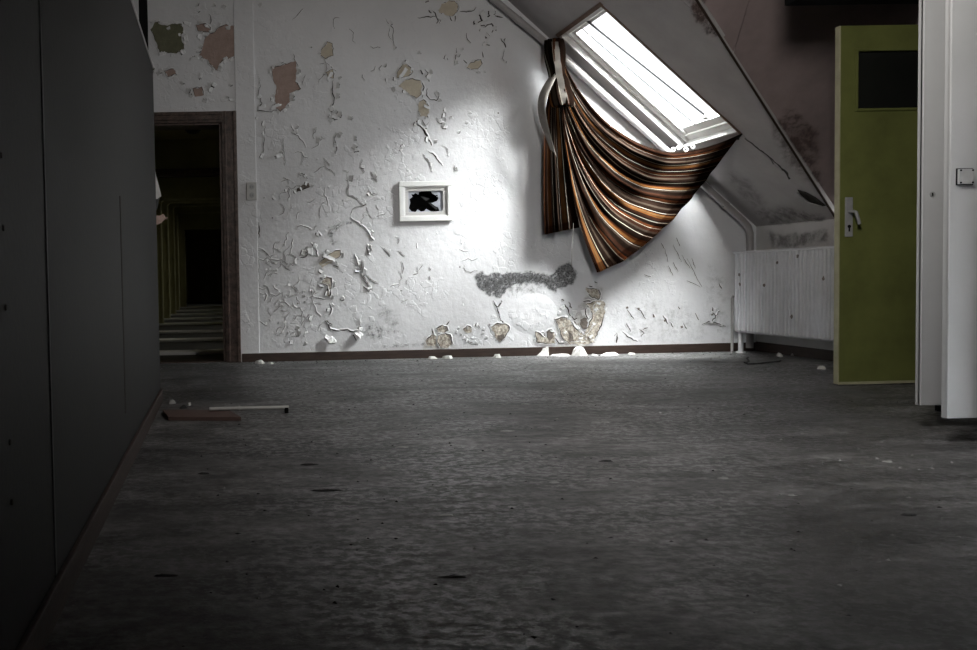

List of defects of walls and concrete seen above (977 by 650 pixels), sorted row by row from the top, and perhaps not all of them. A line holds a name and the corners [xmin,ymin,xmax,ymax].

peeling [149,0,237,103]
peeling [361,50,472,134]
peeling [255,40,445,346]
flaking render [425,300,511,359]